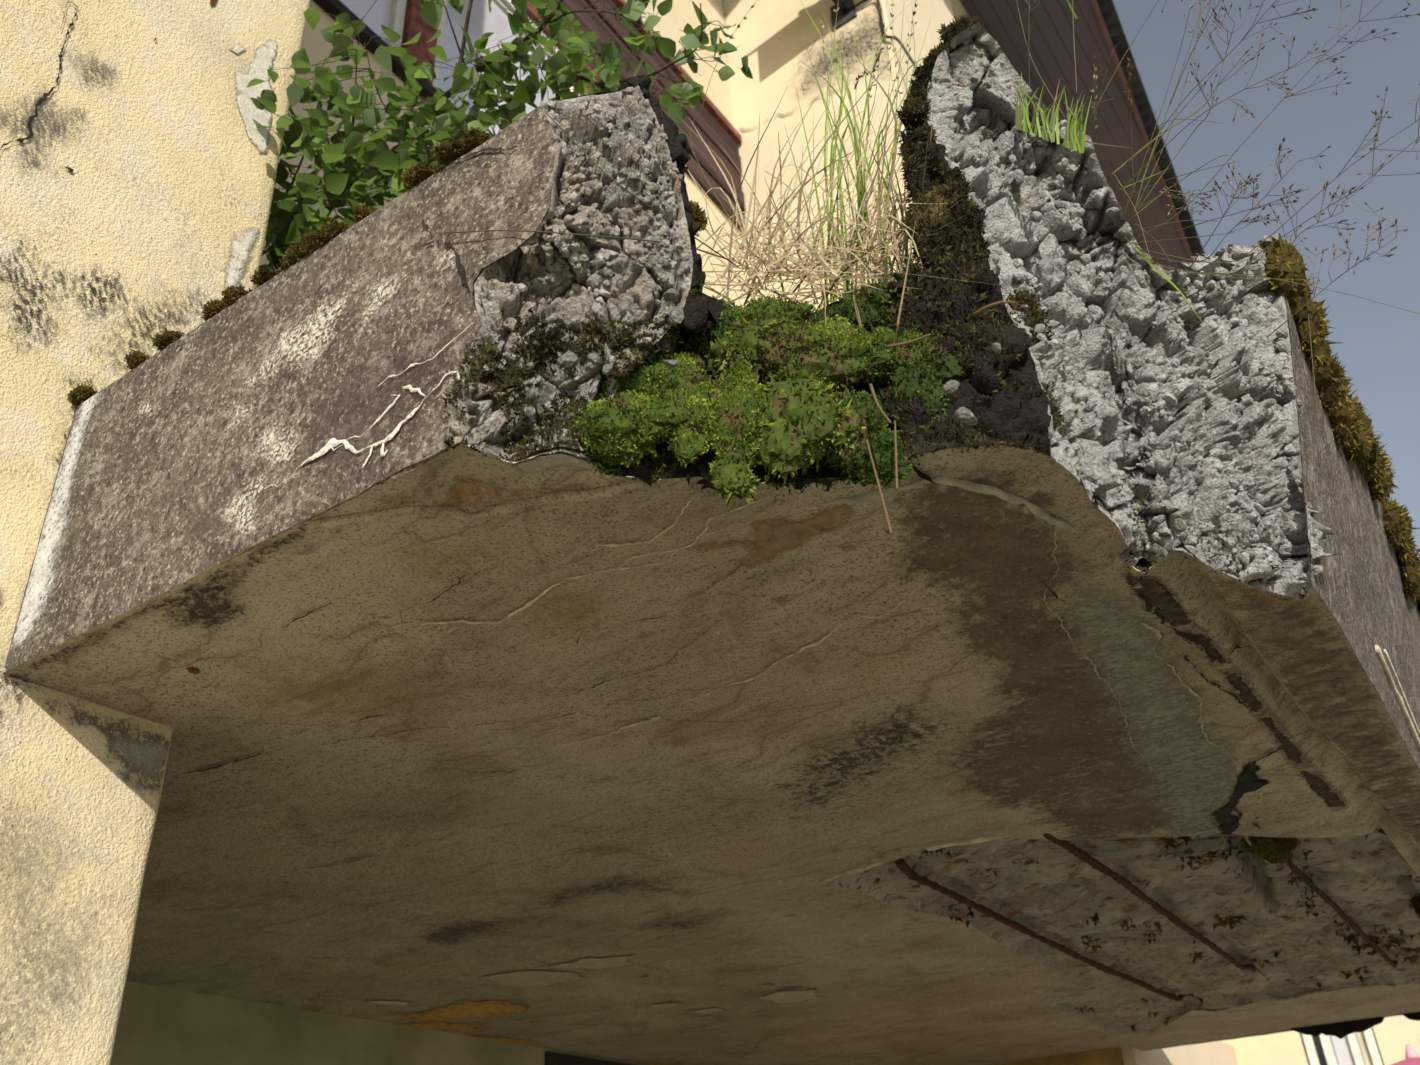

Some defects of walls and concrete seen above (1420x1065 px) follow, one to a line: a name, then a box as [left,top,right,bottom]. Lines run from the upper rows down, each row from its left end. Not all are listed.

crack [0,0,79,150]
peeling [229,39,278,154]
leakage [13,373,105,645]
leakage [0,240,208,369]
leakage [0,524,307,702]
peeling [224,227,260,288]
leakage [224,276,474,534]
spalling [446,85,693,460]
leakage [557,472,1238,840]
spalling [926,23,1350,811]
spalling [820,765,1420,1037]